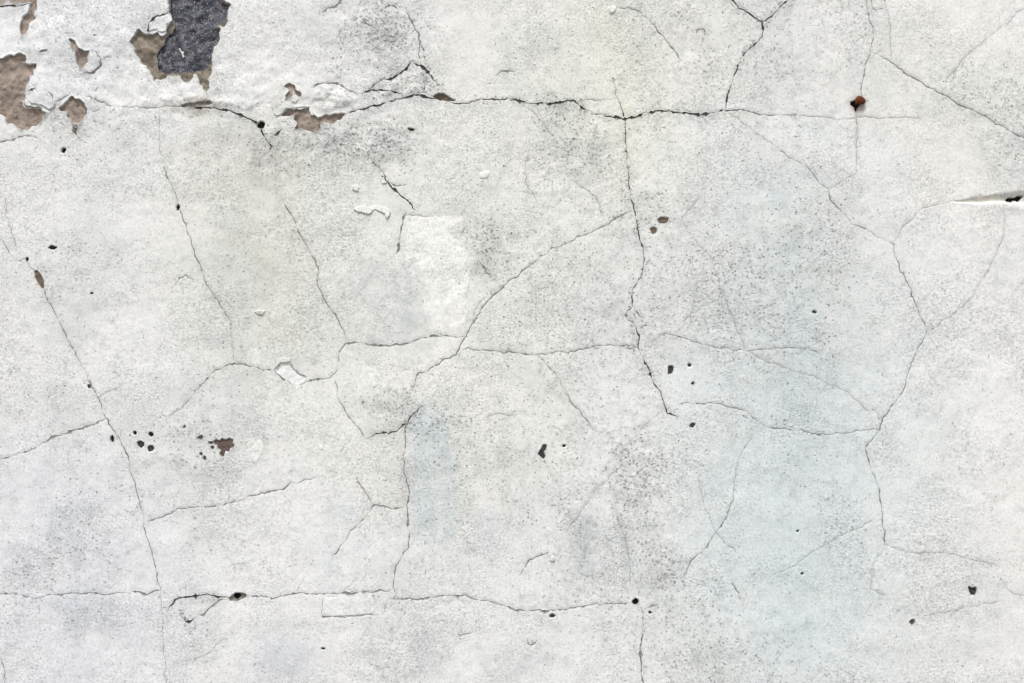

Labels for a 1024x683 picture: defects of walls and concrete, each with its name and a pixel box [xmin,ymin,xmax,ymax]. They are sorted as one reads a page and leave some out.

peeling [0,0,37,35]
peeling [0,53,110,140]
peeling [69,21,101,76]
peeling [116,0,231,108]
crack [88,96,282,156]
peeling [274,84,344,133]
corrosion [844,92,868,144]
crack [860,0,1024,138]
flaking render [955,194,1006,202]
crack [165,0,911,683]
crack [653,198,1005,573]
crack [0,290,313,682]